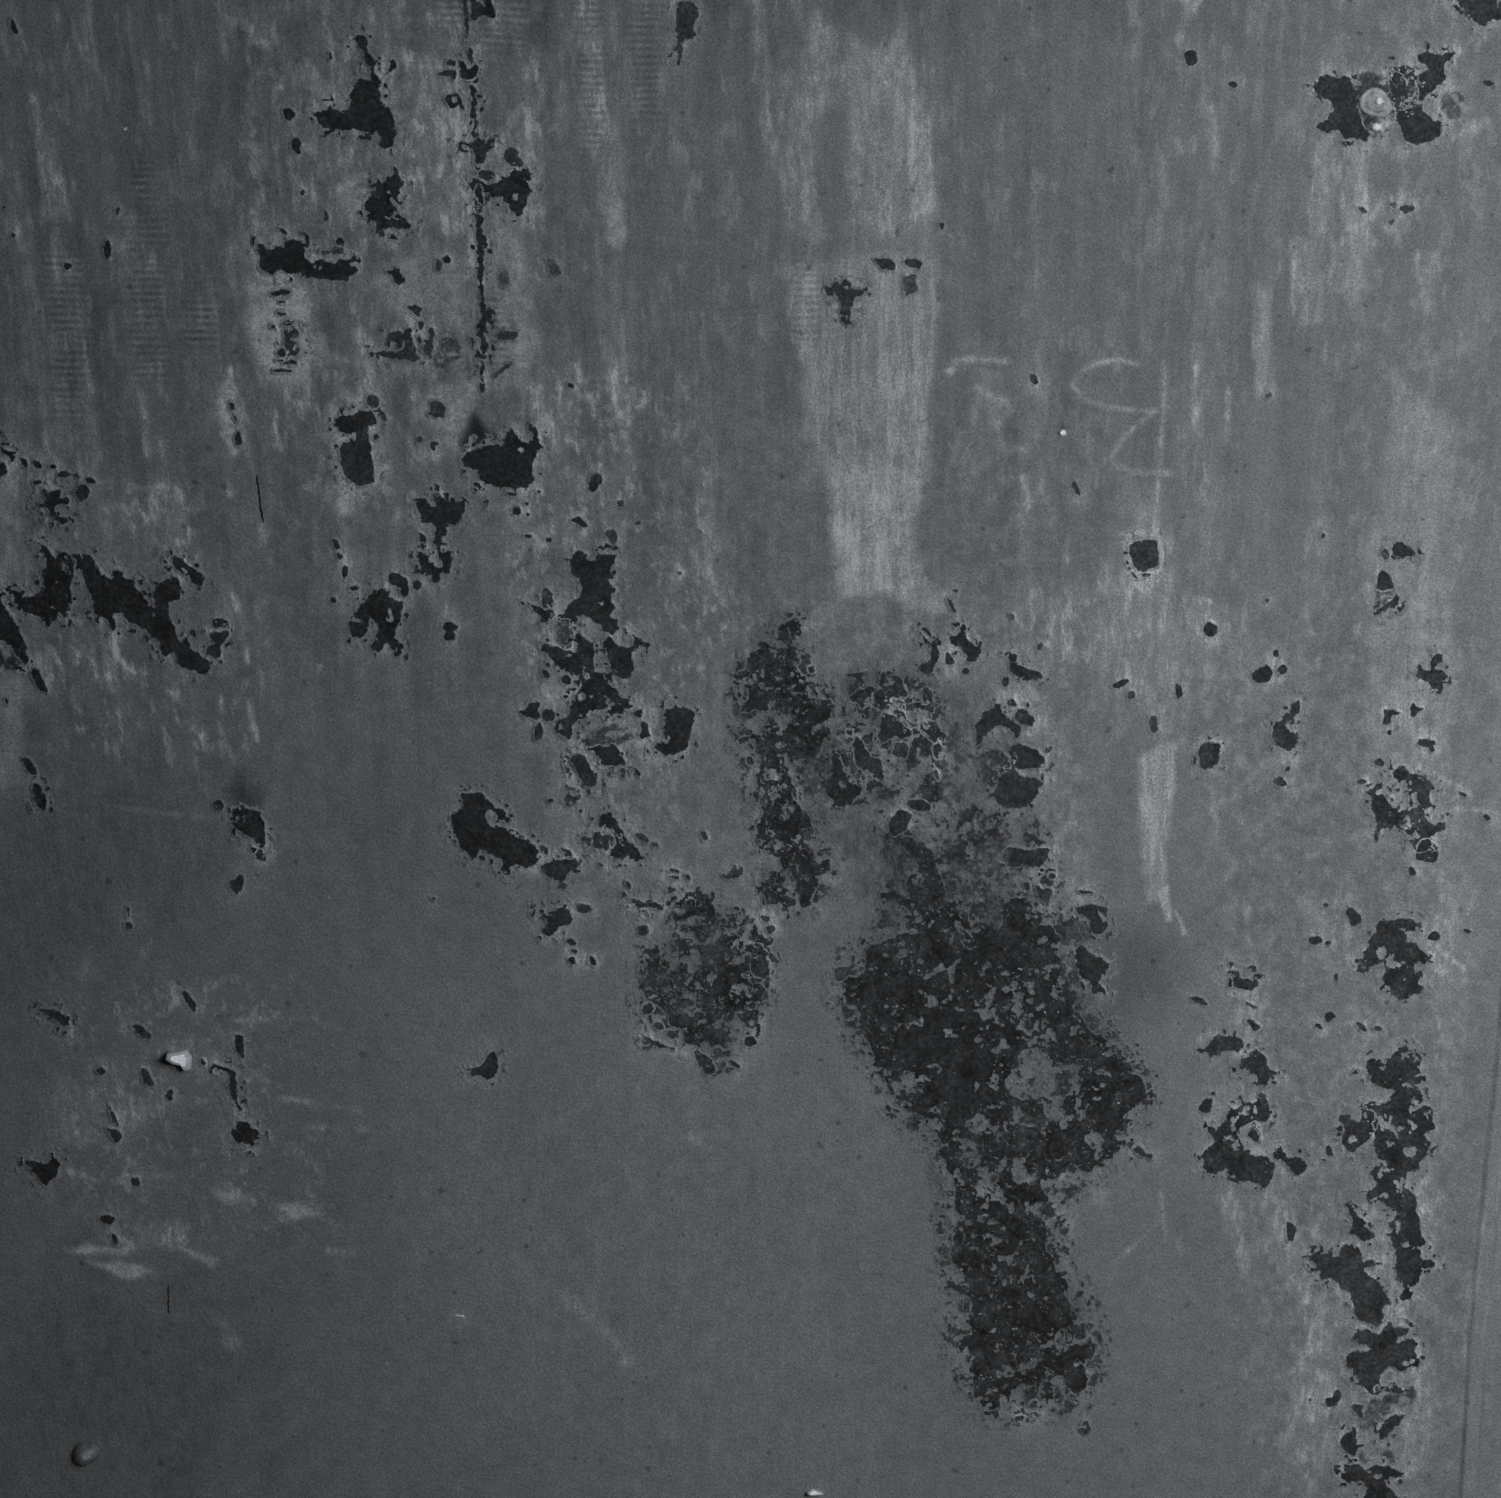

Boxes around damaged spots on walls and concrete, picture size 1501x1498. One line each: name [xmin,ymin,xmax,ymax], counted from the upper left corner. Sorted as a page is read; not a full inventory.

peeling [1226,79,1241,92]
peeling [1302,0,1501,157]
peeling [247,23,461,376]
peeling [458,144,545,227]
peeling [0,417,240,696]
peeling [1369,534,1426,627]
peeling [326,252,1168,1437]
peeling [1354,644,1469,880]
peeling [1480,810,1493,823]
peeling [1306,900,1443,1011]
peeling [1186,960,1448,1498]